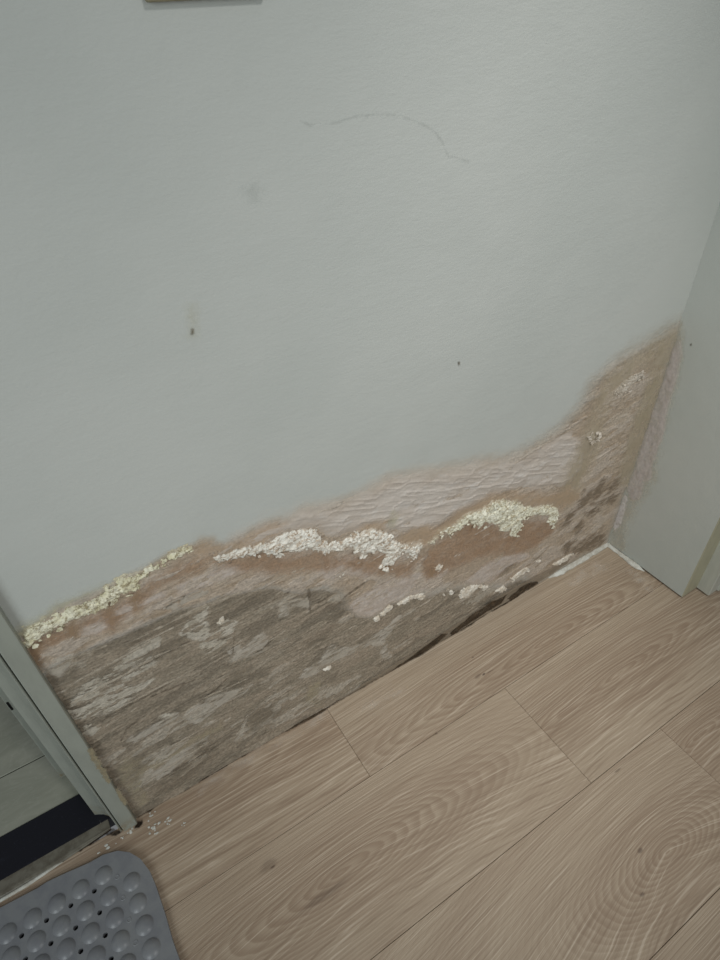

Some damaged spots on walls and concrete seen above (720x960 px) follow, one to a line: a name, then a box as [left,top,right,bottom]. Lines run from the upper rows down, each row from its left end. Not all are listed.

leakage [18,334,681,731]
flaking render [21,325,679,818]